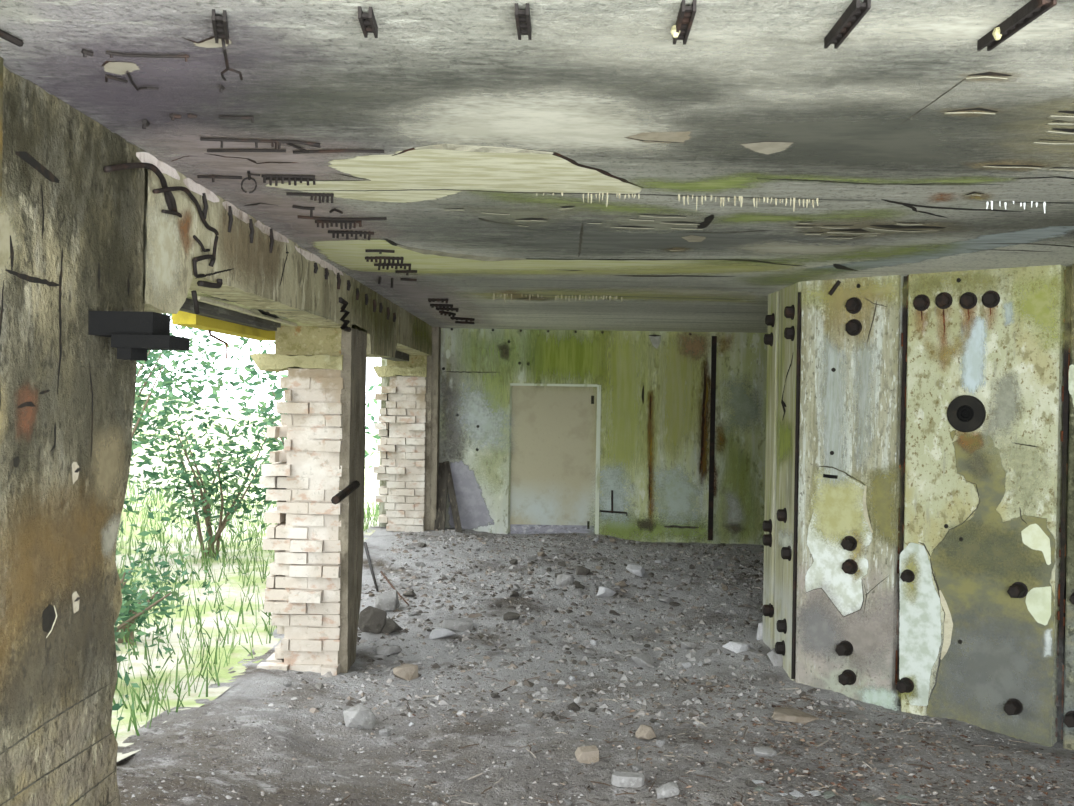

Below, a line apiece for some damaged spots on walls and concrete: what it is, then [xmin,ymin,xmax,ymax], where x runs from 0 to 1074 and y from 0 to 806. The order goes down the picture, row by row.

water stain [869,15,1011,44]
water stain [1006,17,1074,44]
water stain [38,34,1074,280]
peeling [625,131,691,144]
flaking render [103,137,798,332]
corrosion [928,308,973,362]
water stain [441,389,507,461]
water stain [599,467,630,522]
water stain [654,469,700,524]
peeling [1021,524,1051,565]
peeling [805,469,941,706]
peeling [1026,586,1051,625]